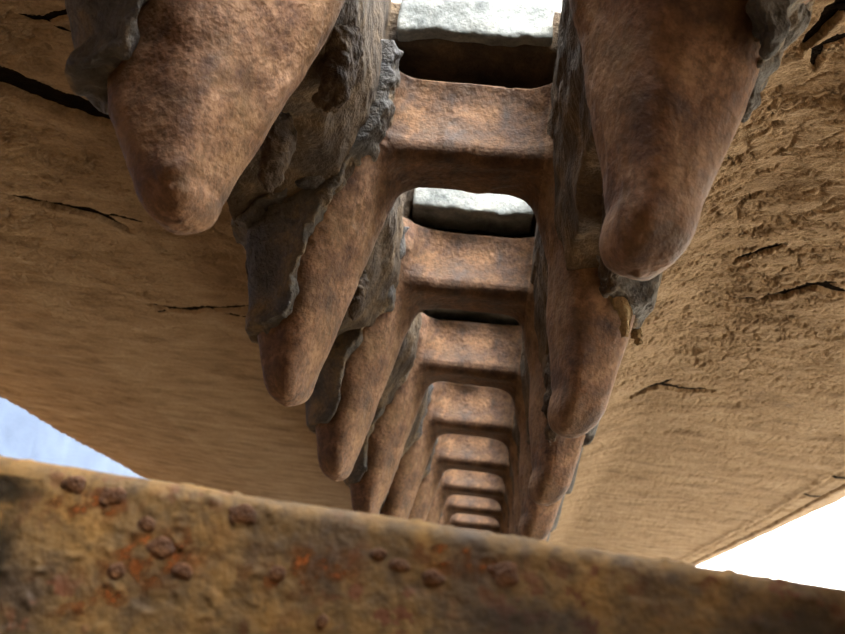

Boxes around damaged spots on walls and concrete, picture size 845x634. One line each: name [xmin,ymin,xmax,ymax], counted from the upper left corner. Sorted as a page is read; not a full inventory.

crack [21,9,71,32]
crack [802,0,845,65]
crack [0,66,110,119]
crack [14,195,149,223]
crack [734,281,845,299]
crack [150,303,248,317]
crack [635,379,706,393]
corrosion [49,475,127,517]
corrosion [228,503,257,525]
corrosion [60,516,202,615]